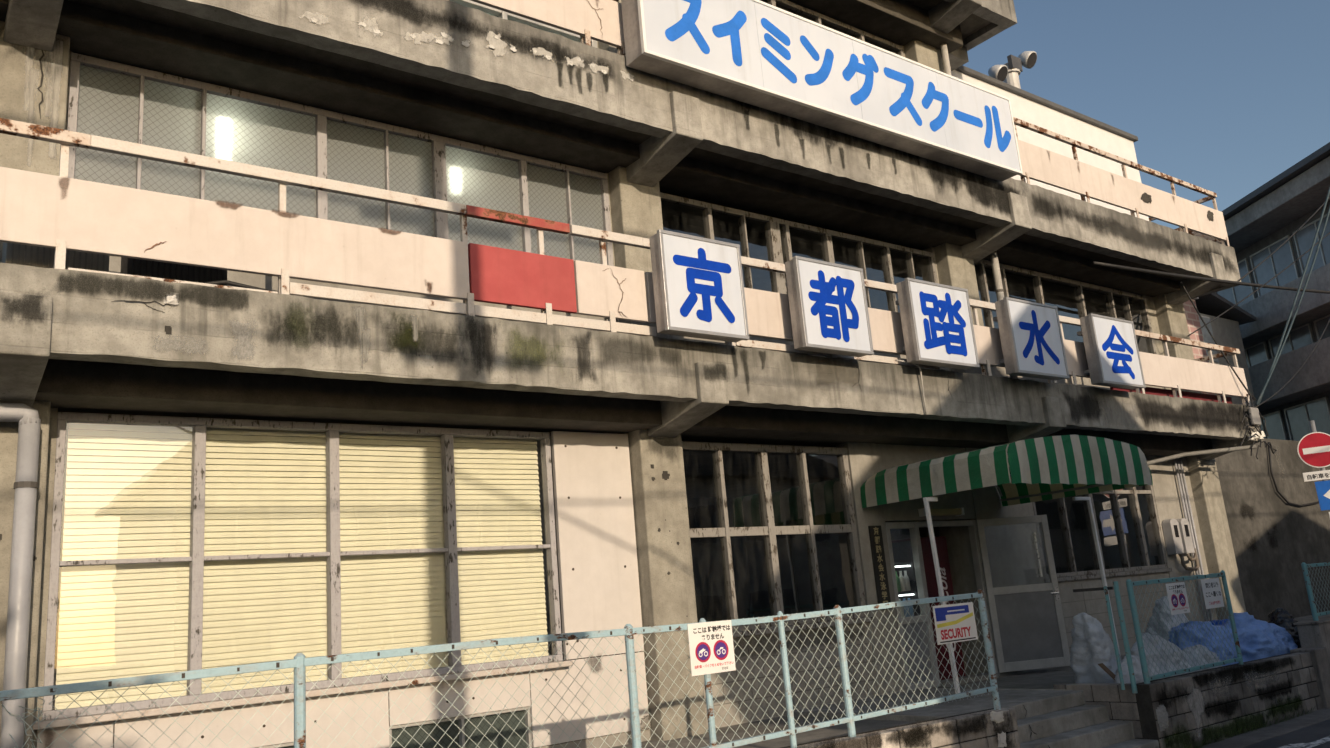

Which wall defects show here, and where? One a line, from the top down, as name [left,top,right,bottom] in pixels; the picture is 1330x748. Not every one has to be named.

peeling [299,11,329,25]
peeling [358,17,384,36]
peeling [404,31,470,47]
peeling [486,31,634,82]
crack [36,50,44,119]
leakage [773,114,1235,270]
leakage [3,294,44,320]
leakage [58,274,295,358]
leakage [576,334,595,380]
leakage [705,348,765,387]
leakage [1065,394,1249,430]
leakage [797,713,1014,748]